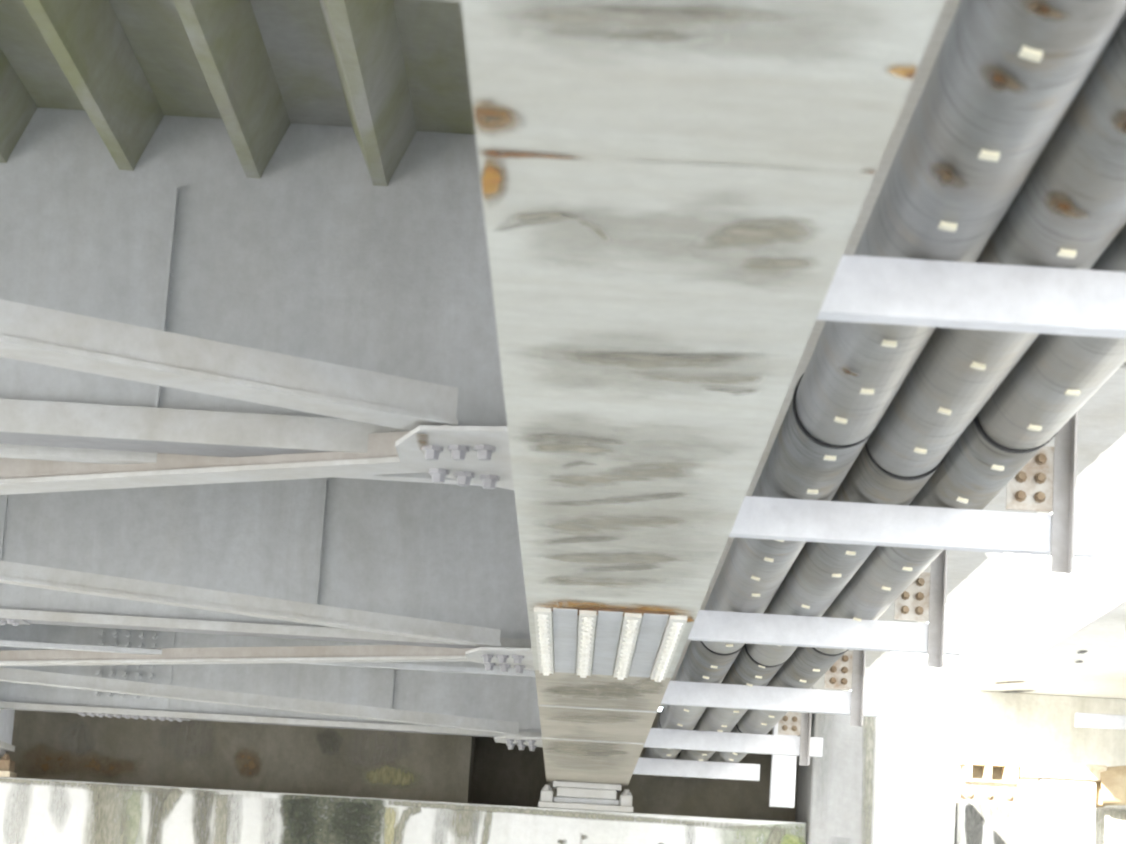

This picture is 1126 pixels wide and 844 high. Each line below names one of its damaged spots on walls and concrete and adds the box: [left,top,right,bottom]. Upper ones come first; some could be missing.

corrosion [1025,0,1066,19]
corrosion [985,69,1022,91]
corrosion [475,108,514,130]
corrosion [482,159,505,197]
corrosion [1048,194,1085,218]
leakage [537,435,684,487]
leakage [550,518,678,587]
corrosion [542,601,693,622]
leakage [354,731,413,787]
leakage [0,724,182,844]
leakage [193,789,238,844]
leakage [335,801,738,844]